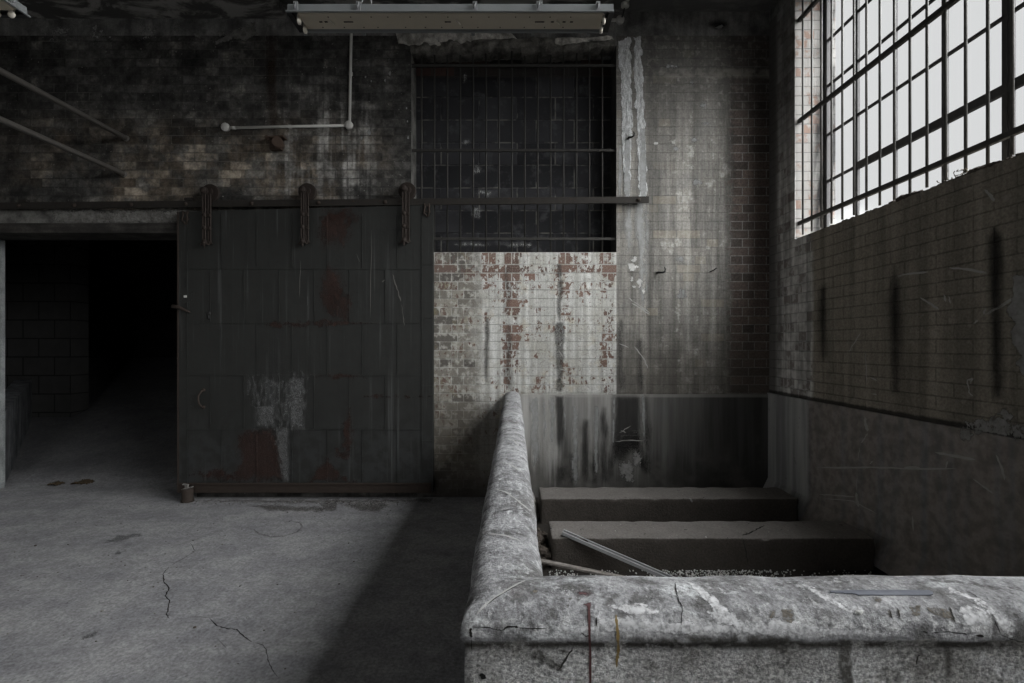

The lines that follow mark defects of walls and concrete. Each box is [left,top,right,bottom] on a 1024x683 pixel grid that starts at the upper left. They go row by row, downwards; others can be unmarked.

damp [618,36,649,302]
damp [530,265,650,481]
crack [163,543,277,676]